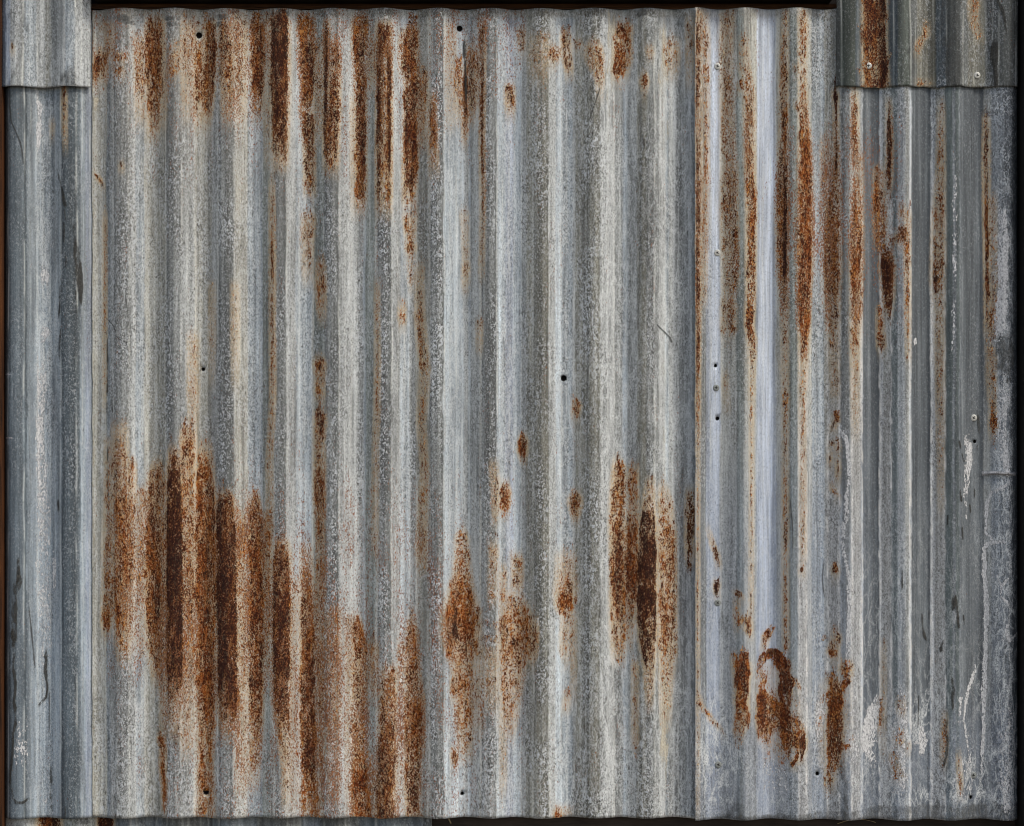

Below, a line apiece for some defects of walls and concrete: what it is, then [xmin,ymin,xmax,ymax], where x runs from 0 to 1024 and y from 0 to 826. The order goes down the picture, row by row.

rust [94,8,485,819]
rust [440,464,538,785]
rust [517,428,528,465]
rust [554,544,578,669]
rust [569,488,581,523]
rust [608,451,720,759]
rust [647,8,758,574]
rust [696,0,911,800]